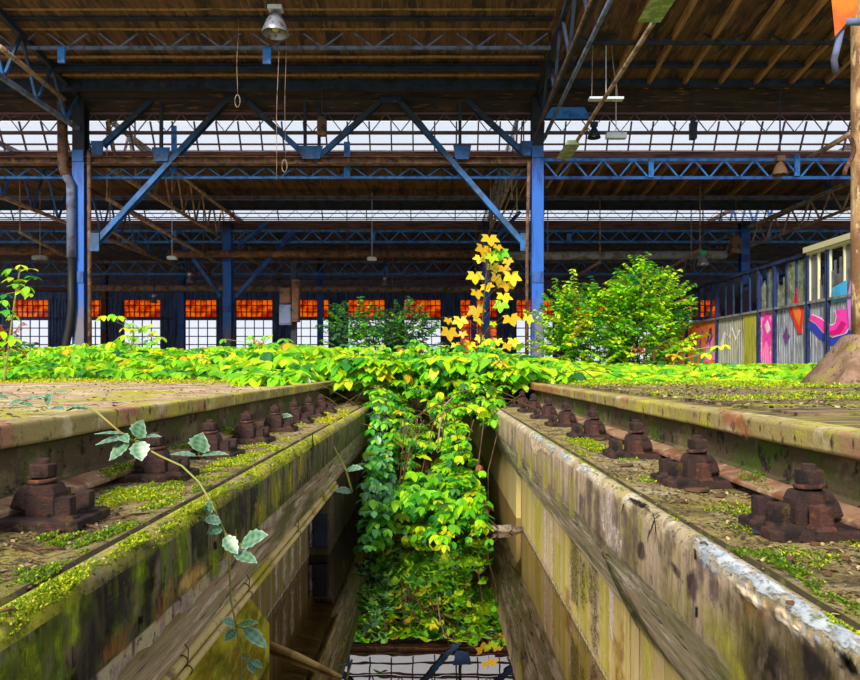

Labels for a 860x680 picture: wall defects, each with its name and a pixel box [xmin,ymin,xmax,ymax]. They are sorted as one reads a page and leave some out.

leakage [0,545,159,680]
leakage [199,638,265,680]
leakage [522,508,614,680]
leakage [672,559,715,599]
leakage [718,597,857,680]